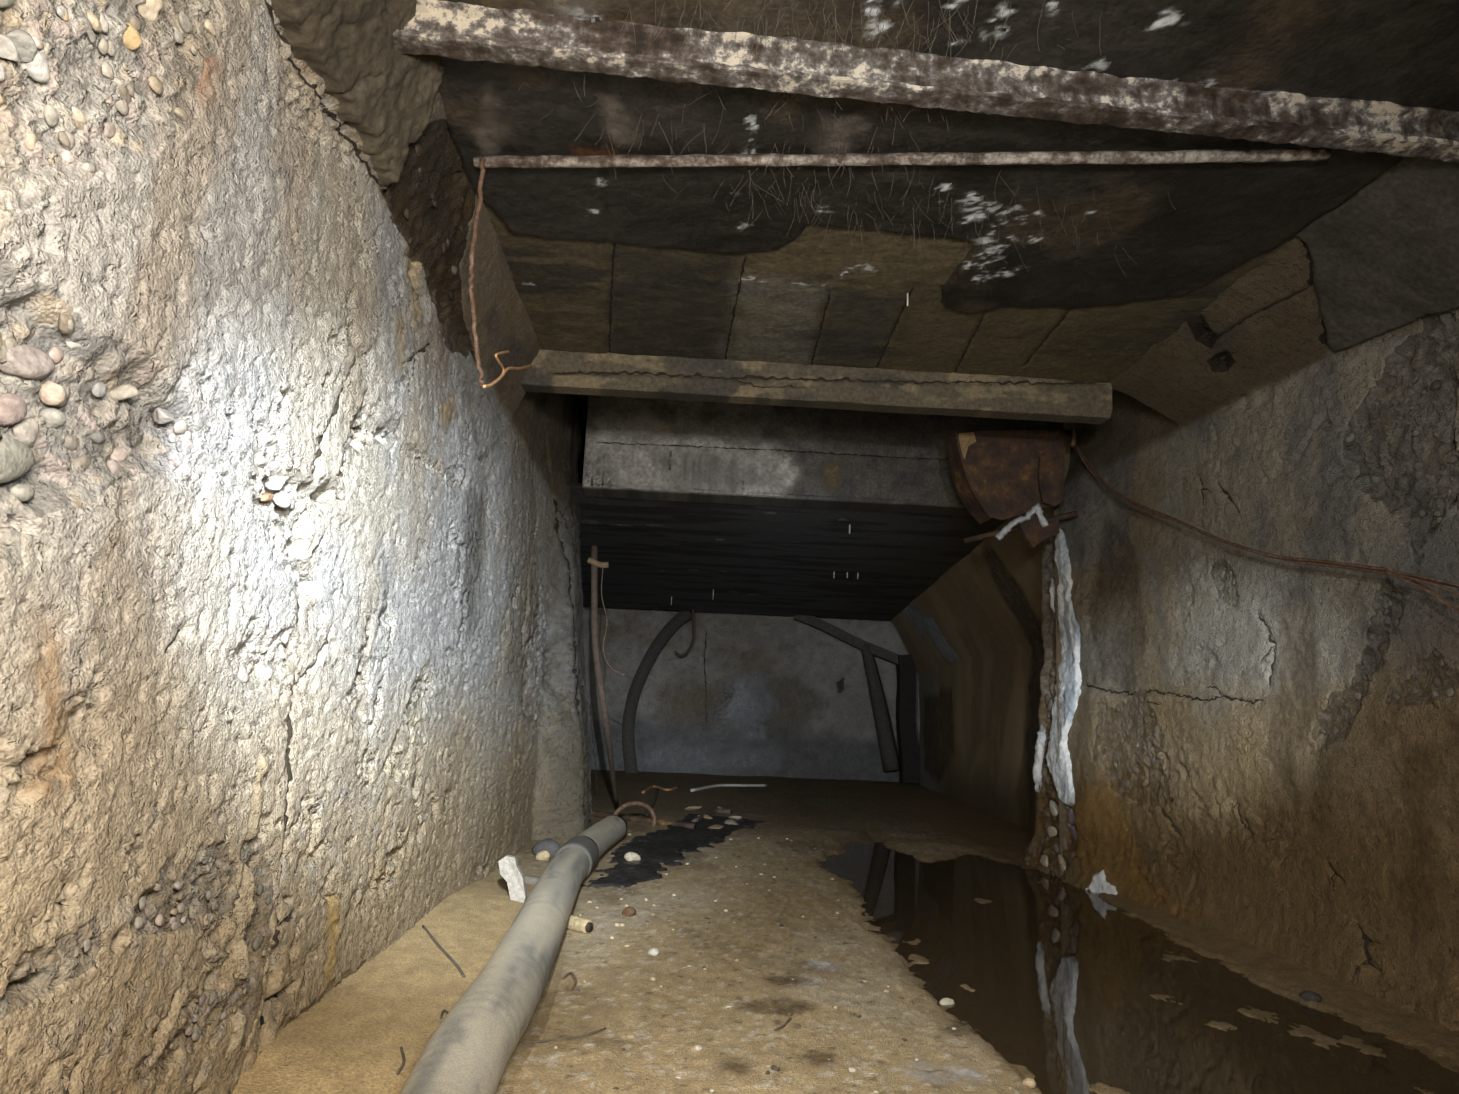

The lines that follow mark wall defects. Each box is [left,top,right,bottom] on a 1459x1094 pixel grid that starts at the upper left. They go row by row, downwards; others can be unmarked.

leakage [962,194,1017,280]
crack [312,357,356,473]
leakage [985,503,1144,806]
crack [1087,612,1276,705]
crack [281,601,329,873]
crack [271,910,293,950]
crack [260,992,278,1028]